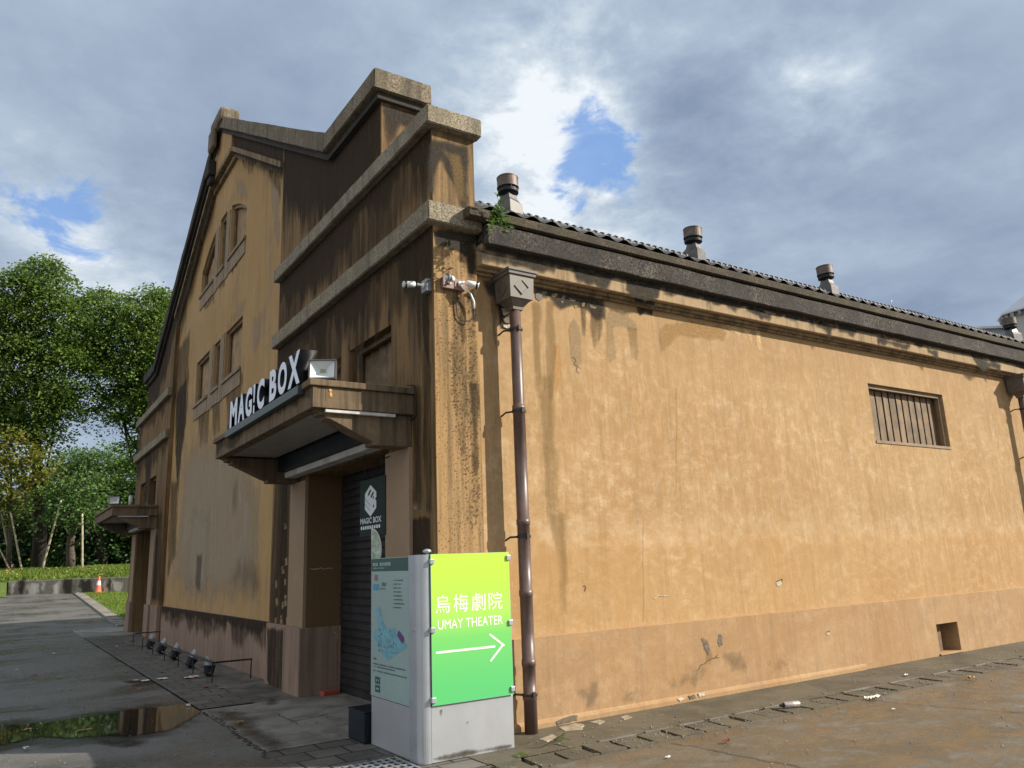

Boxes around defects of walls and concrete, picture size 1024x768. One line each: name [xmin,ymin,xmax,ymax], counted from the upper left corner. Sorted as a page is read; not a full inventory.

damp [280,129,430,329]
damp [469,242,1024,372]
damp [136,192,269,646]
damp [449,296,480,529]
peeling [701,634,723,655]